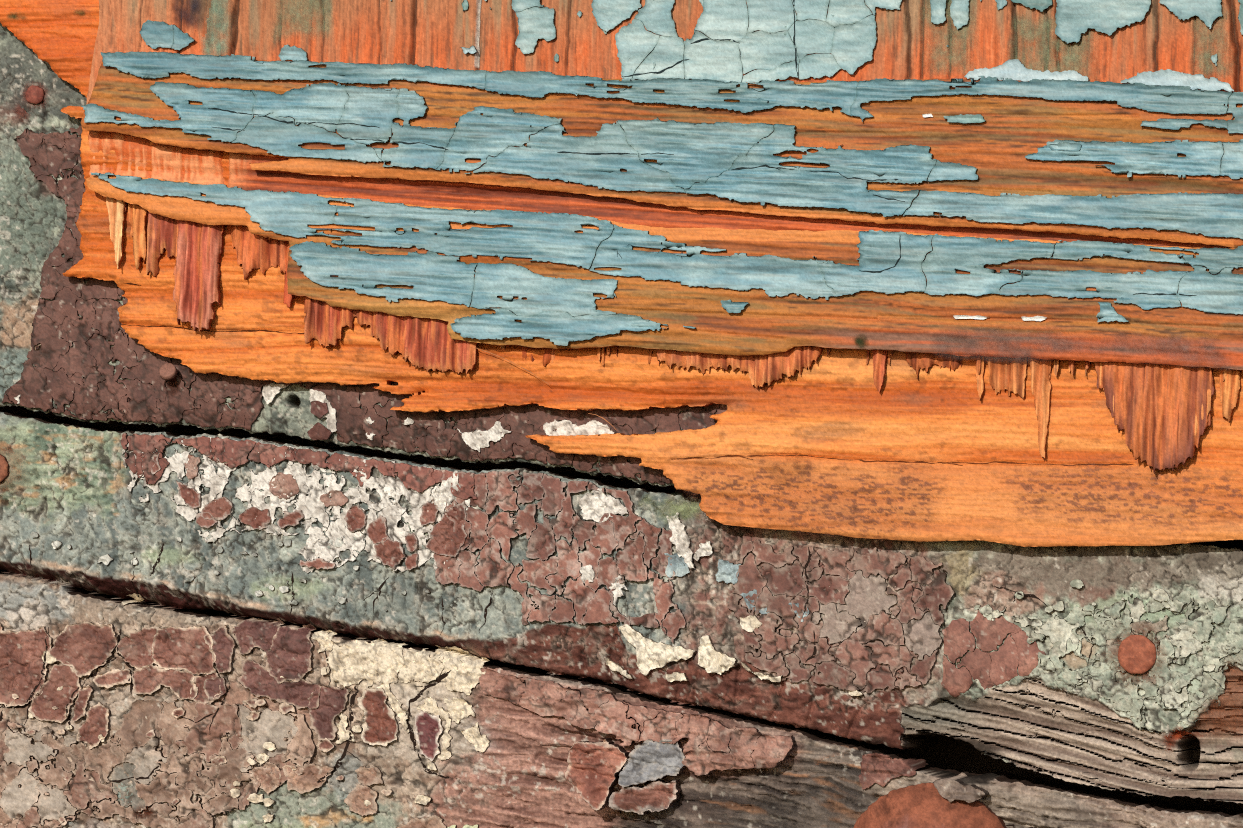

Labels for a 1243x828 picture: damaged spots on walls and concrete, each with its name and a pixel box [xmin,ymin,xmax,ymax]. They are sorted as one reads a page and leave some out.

peeling [2,0,1243,485]
peeling [30,532,72,549]
peeling [96,554,114,565]
crack [131,544,164,597]
crack [479,593,493,630]
peeling [121,433,1243,730]
crack [802,547,823,665]
crack [0,627,49,728]
crack [66,629,135,729]
crack [317,649,361,783]
peeling [0,617,795,828]
crack [406,670,451,778]